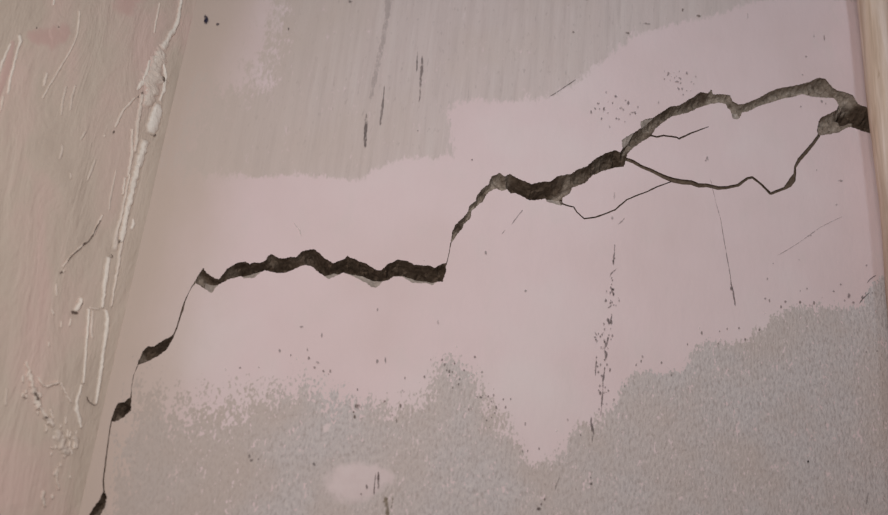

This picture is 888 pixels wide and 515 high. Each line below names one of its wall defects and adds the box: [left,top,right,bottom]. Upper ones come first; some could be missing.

peeling [136,0,787,193]
crack [87,78,870,515]
peeling [96,275,888,515]